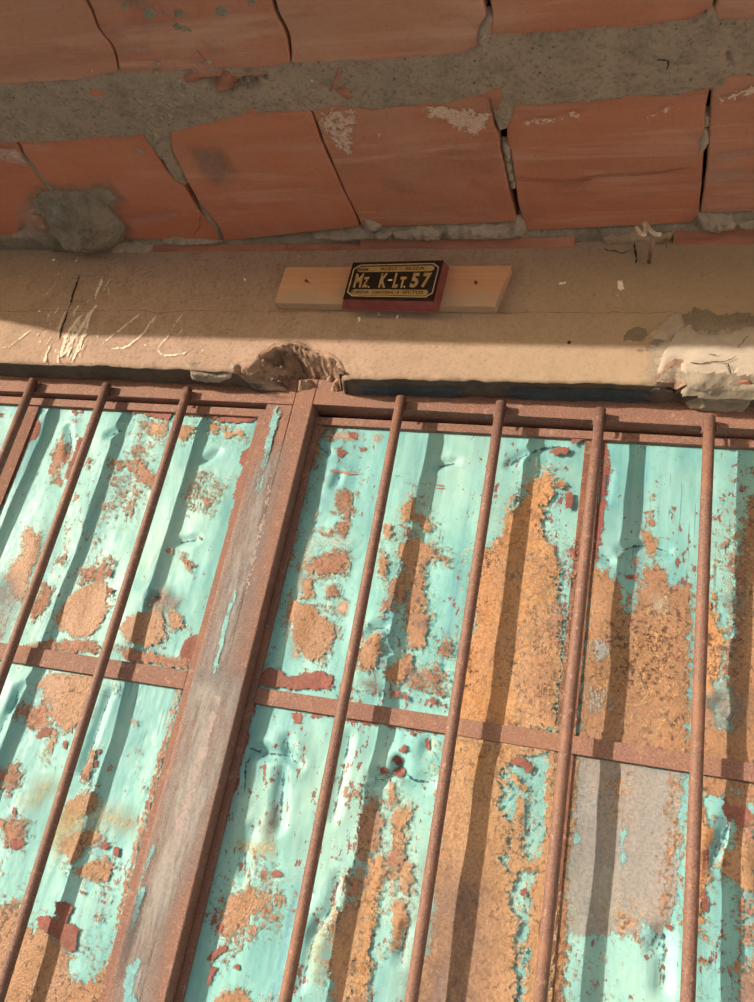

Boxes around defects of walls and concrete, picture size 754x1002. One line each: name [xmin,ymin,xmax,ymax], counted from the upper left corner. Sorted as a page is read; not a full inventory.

crack [59,275,80,339]
spalling [187,340,347,392]
spalling [652,359,688,389]